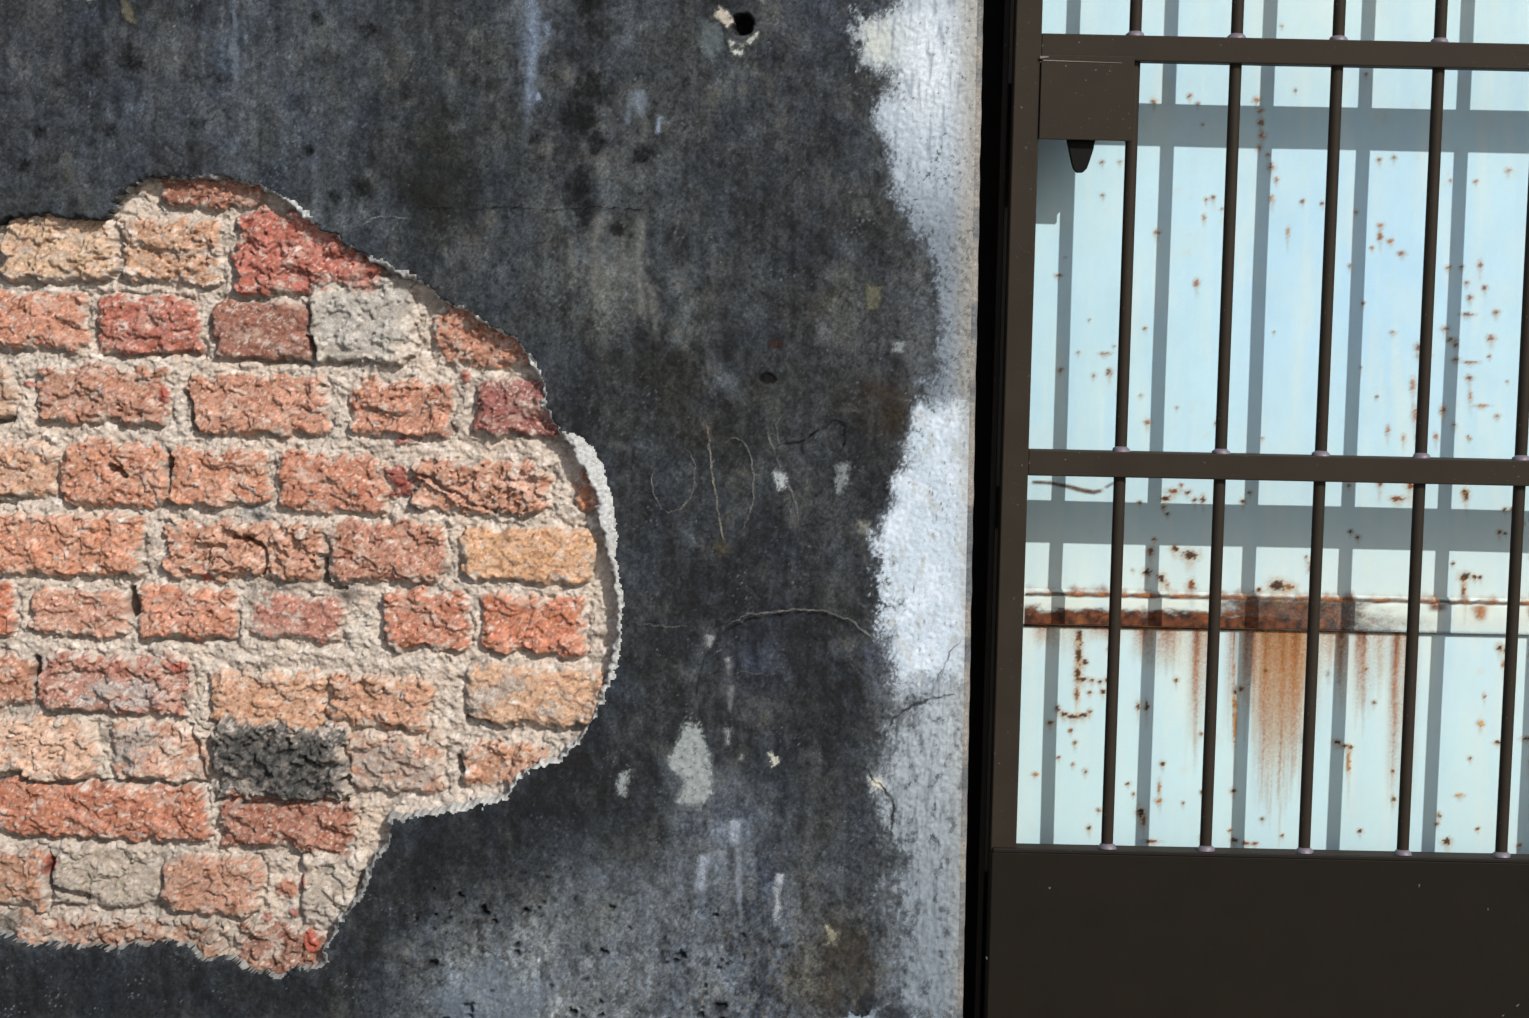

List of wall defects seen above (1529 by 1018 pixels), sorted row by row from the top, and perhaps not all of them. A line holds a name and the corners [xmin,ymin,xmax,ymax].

leakage [526,0,550,106]
leakage [627,92,663,162]
leakage [563,71,657,326]
corrosion [1444,327,1498,417]
corrosion [1161,484,1206,515]
flaking render [0,174,625,979]
crack [724,599,875,643]
corrosion [1024,538,1529,758]
leakage [729,820,740,842]
corrosion [1125,762,1165,843]
leakage [699,855,710,889]
leakage [774,874,783,920]